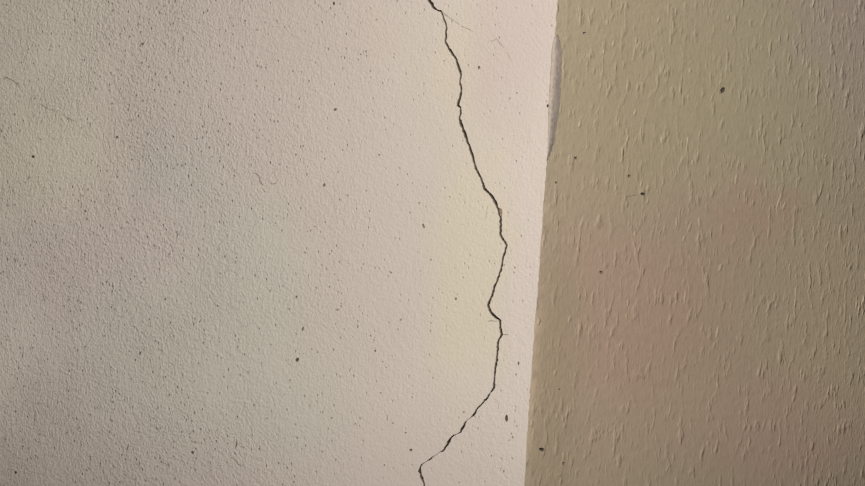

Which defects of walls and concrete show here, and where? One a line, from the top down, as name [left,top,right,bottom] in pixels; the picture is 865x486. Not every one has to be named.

crack [418,0,508,486]